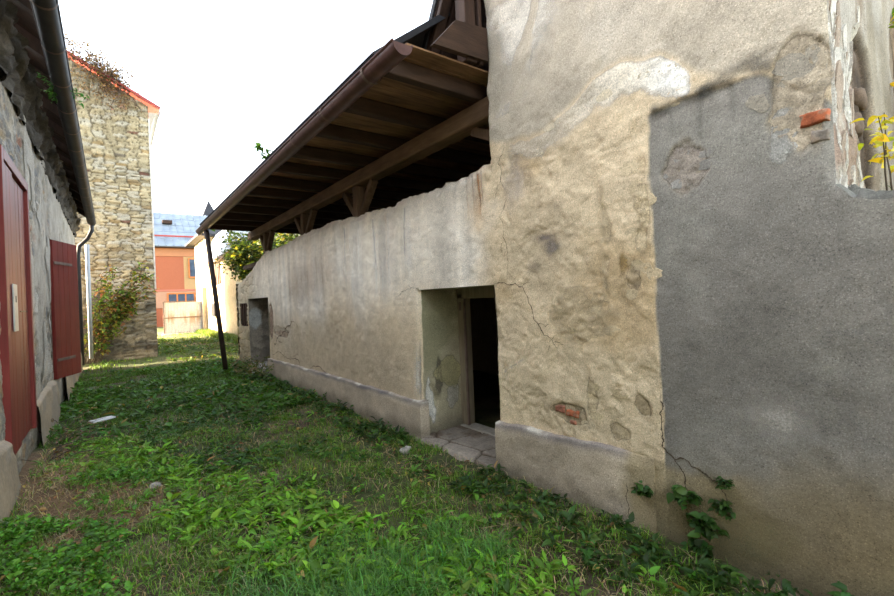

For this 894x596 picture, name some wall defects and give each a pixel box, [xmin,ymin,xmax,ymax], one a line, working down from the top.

flaking render [745,0,869,189]
crack [495,149,565,359]
flaking render [549,379,651,440]
crack [659,393,732,500]